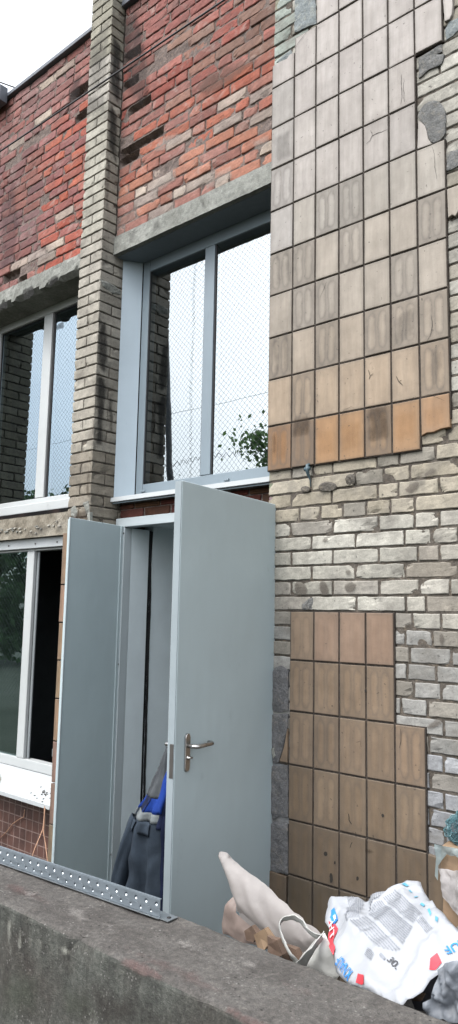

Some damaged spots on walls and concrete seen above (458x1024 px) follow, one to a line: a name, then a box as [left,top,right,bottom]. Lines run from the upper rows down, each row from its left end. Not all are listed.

spalling [294,0,317,33]
spalling [418,18,458,79]
spalling [418,100,447,143]
spalling [446,149,458,172]